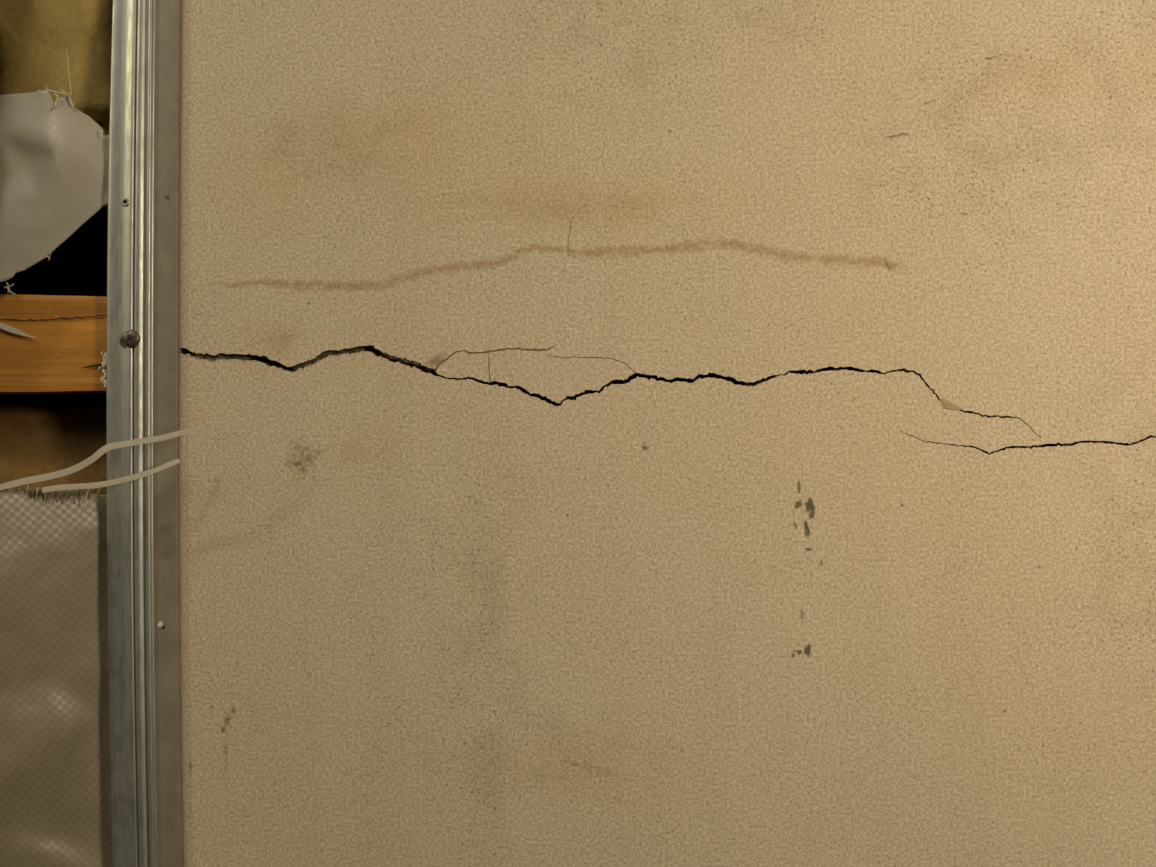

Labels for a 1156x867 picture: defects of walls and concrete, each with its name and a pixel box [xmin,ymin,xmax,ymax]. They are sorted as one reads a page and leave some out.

crack [180,345,1156,455]